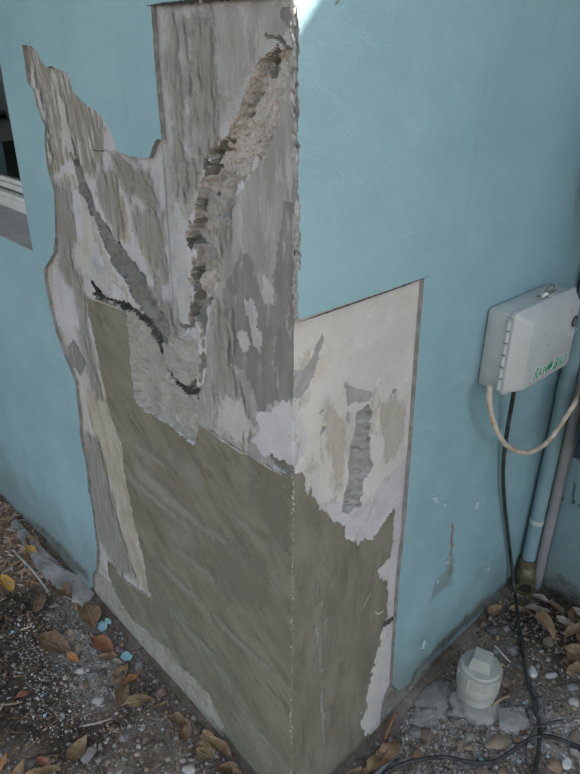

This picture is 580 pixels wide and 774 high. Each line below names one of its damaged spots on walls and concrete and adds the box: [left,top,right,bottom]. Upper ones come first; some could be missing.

peeling [27,0,420,738]